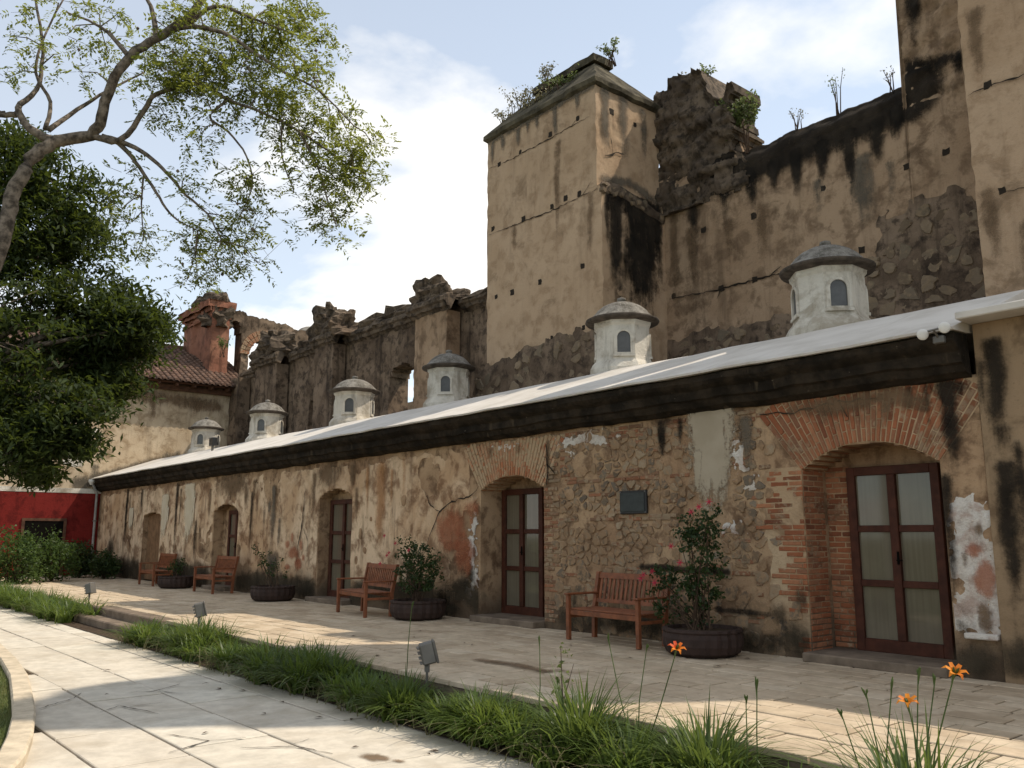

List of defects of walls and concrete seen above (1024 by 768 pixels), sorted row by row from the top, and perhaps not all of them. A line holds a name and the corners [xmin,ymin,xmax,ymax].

damp [904,0,921,43]
damp [489,85,647,212]
damp [704,7,981,240]
damp [587,175,698,306]
spalling [865,185,986,320]
damp [981,189,998,248]
crack [425,487,478,540]
peeling [437,505,480,615]
spalling [555,428,621,477]
peeling [950,493,1001,635]
damp [978,337,1024,586]